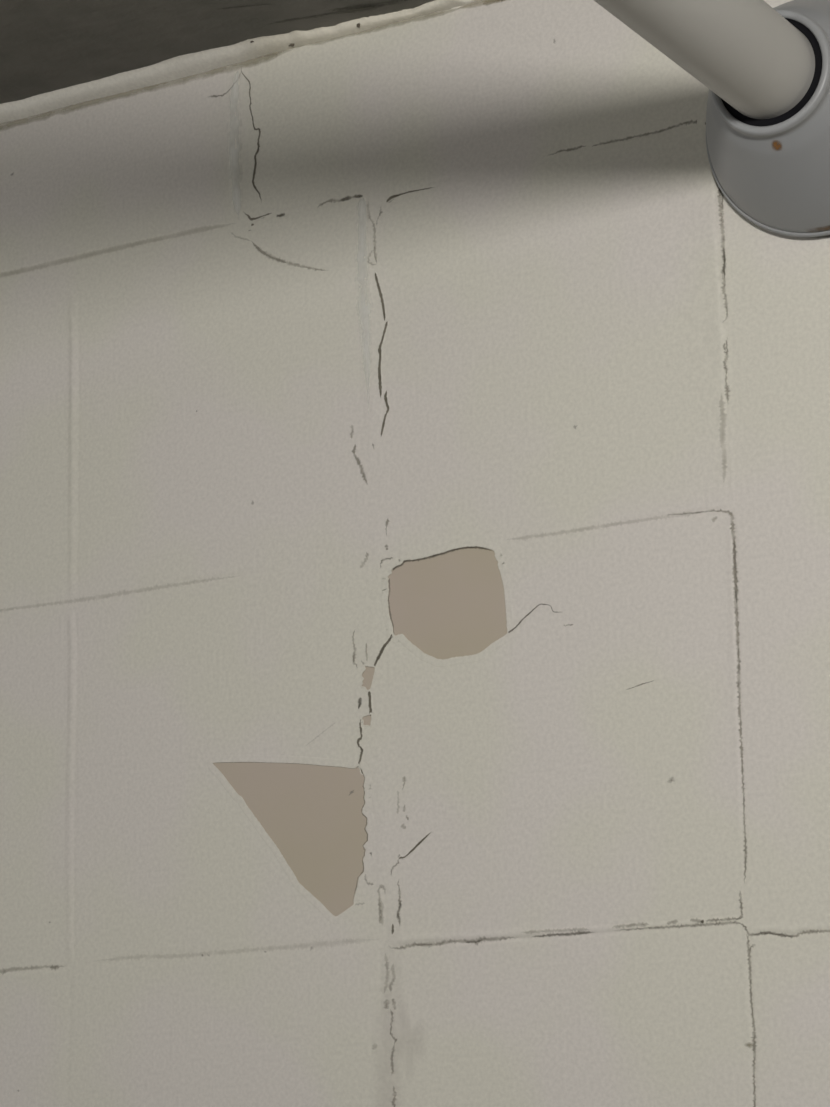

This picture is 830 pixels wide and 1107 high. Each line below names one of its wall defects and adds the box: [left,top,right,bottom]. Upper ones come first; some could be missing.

crack [212,66,285,226]
crack [321,186,436,205]
crack [556,121,706,153]
crack [374,272,391,437]
peeling [381,539,514,667]
crack [508,604,573,633]
crack [353,633,394,775]
peeling [207,755,375,924]
crack [537,930,591,938]